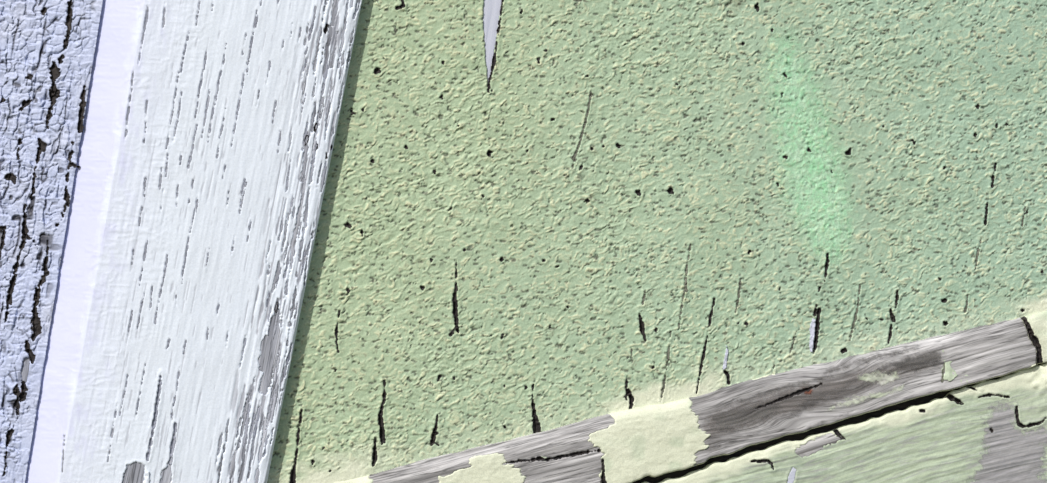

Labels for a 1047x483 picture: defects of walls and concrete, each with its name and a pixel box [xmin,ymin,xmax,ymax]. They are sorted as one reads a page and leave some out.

crack [0,0,86,341]
crack [107,0,316,464]
peeling [217,0,364,483]
crack [3,381,28,476]
peeling [122,458,172,483]
crack [372,380,387,466]
peeling [369,414,615,483]
crack [506,384,607,483]
crack [624,244,691,409]
crack [757,253,830,409]
crack [632,316,1047,483]
peeling [689,309,1047,483]